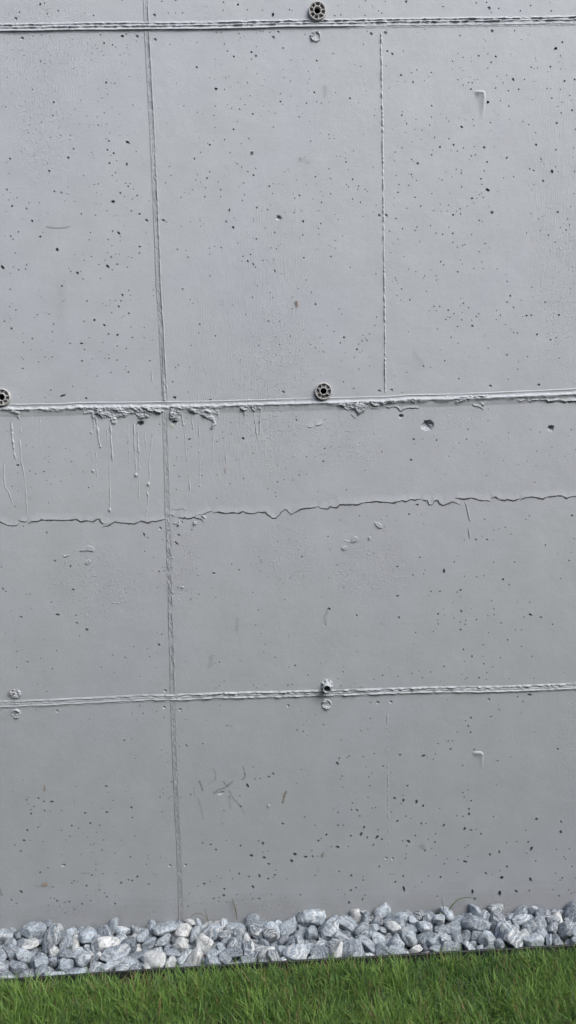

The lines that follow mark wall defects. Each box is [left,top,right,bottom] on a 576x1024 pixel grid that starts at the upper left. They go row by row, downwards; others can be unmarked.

spalling [337,390,576,431]
crack [0,489,576,539]